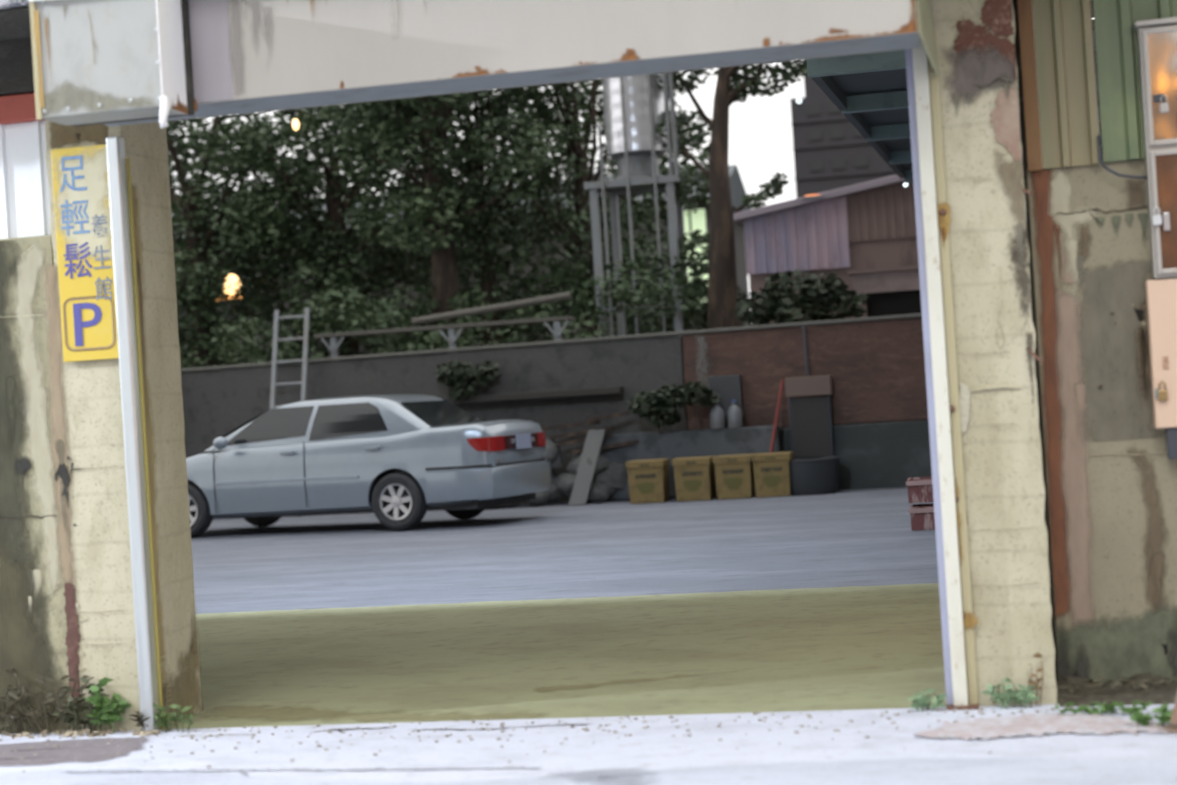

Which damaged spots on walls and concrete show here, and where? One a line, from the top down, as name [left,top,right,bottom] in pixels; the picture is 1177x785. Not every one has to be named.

corrosion [34,10,49,108]
corrosion [171,97,198,114]
corrosion [453,66,506,78]
corrosion [615,49,640,62]
peeling [951,0,1022,162]
damp [0,240,147,766]
corrosion [1032,169,1072,618]
damp [1051,171,1177,682]